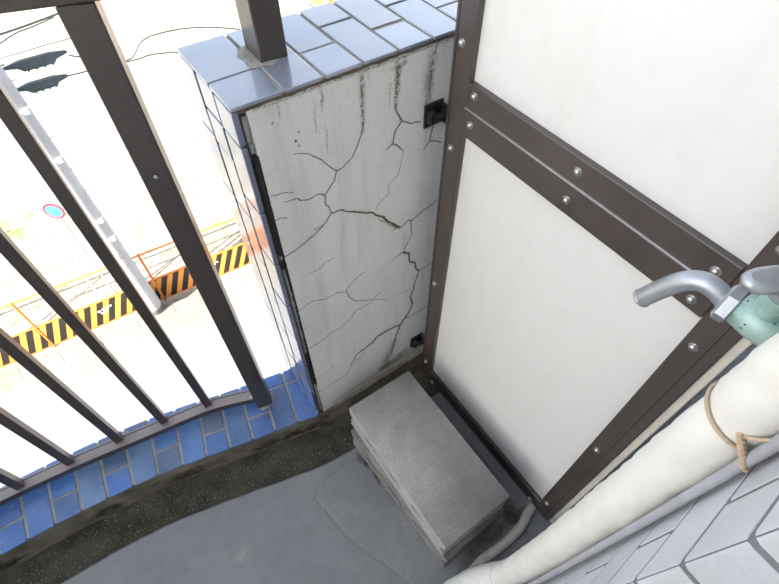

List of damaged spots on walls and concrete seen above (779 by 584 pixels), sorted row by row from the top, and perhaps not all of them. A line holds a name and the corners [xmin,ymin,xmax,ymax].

water stain [358,44,437,124]
crack [271,105,441,392]